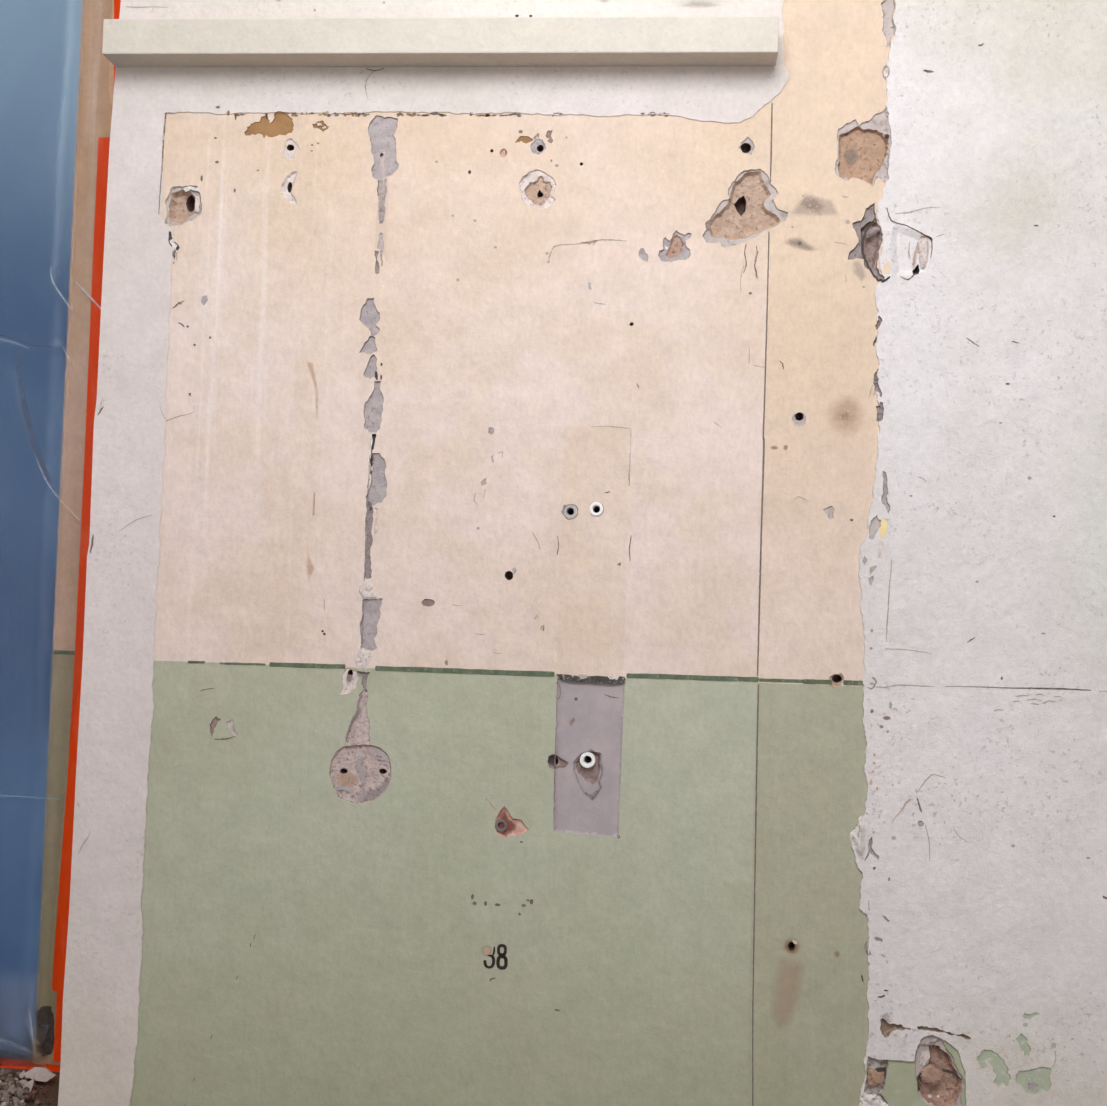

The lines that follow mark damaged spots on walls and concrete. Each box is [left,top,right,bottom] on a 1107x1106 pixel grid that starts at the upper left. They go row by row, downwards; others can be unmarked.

peeling [216,106,370,152]
flaking render [835,107,892,187]
flaking render [519,159,559,210]
flaking render [639,169,788,262]
flaking render [848,203,891,283]
flaking render [859,1034,966,1106]
peeling [976,1042,1056,1095]
peeling [1016,1012,1039,1056]